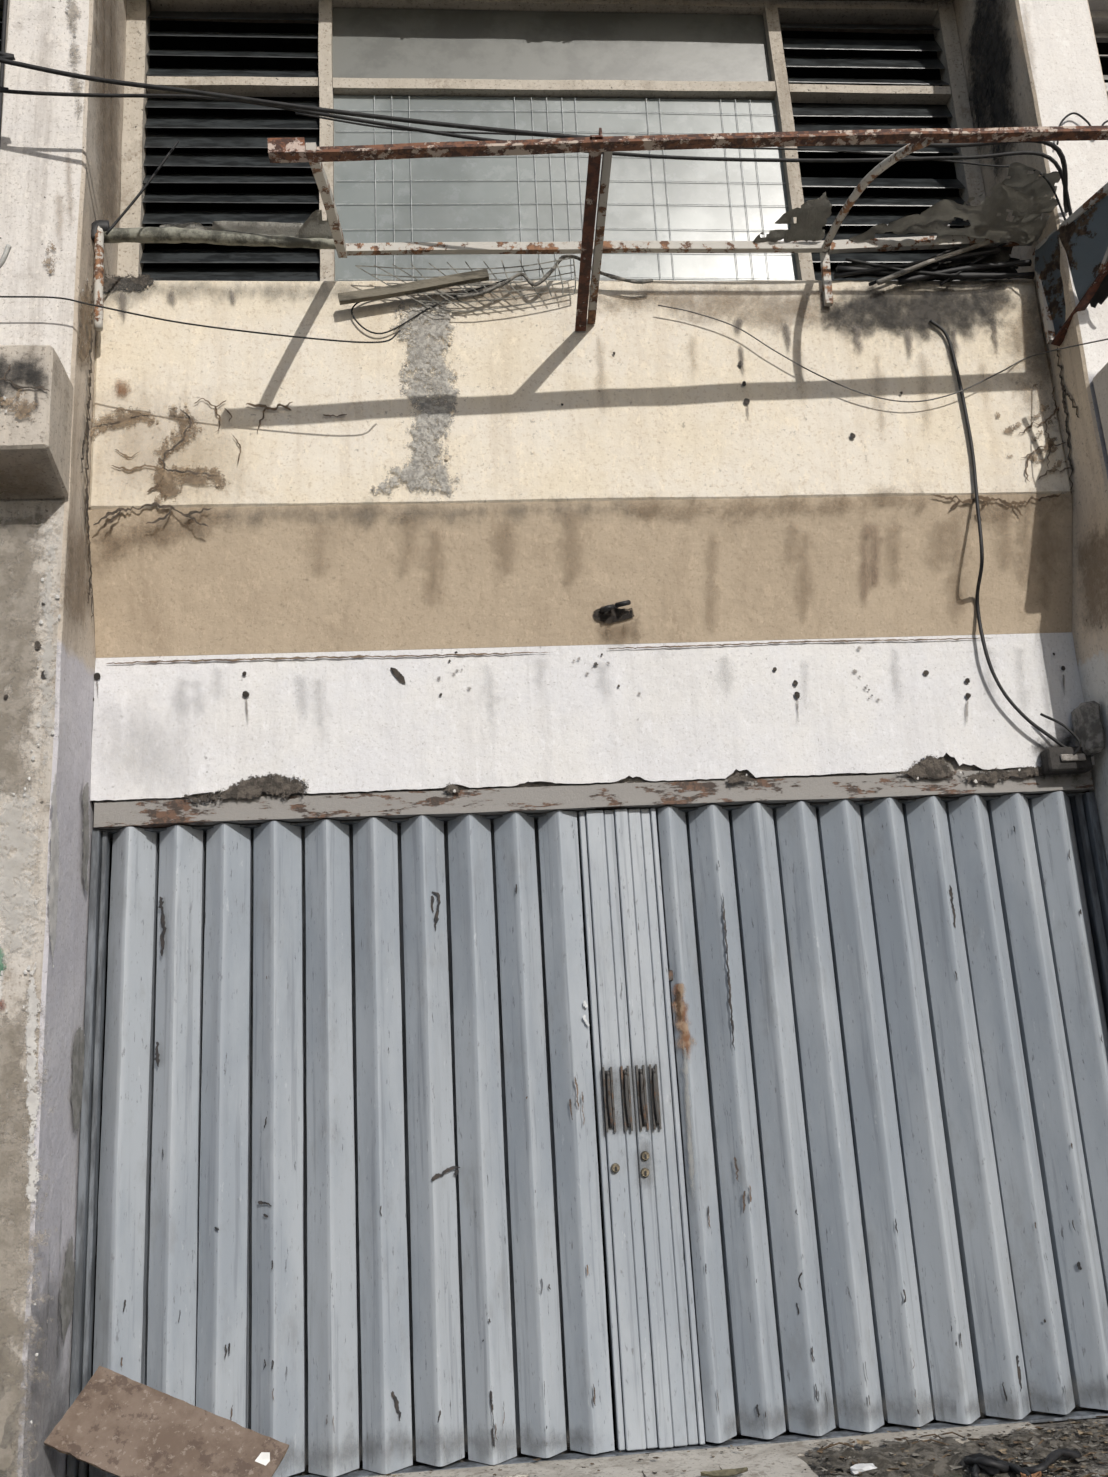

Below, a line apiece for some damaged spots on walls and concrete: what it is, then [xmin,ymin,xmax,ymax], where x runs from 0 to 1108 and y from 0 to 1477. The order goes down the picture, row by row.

damp [0,356,48,406]
crack [81,285,347,621]
damp [821,279,1015,362]
crack [934,347,1079,521]
crack [106,652,551,664]
peeling [0,507,76,1477]